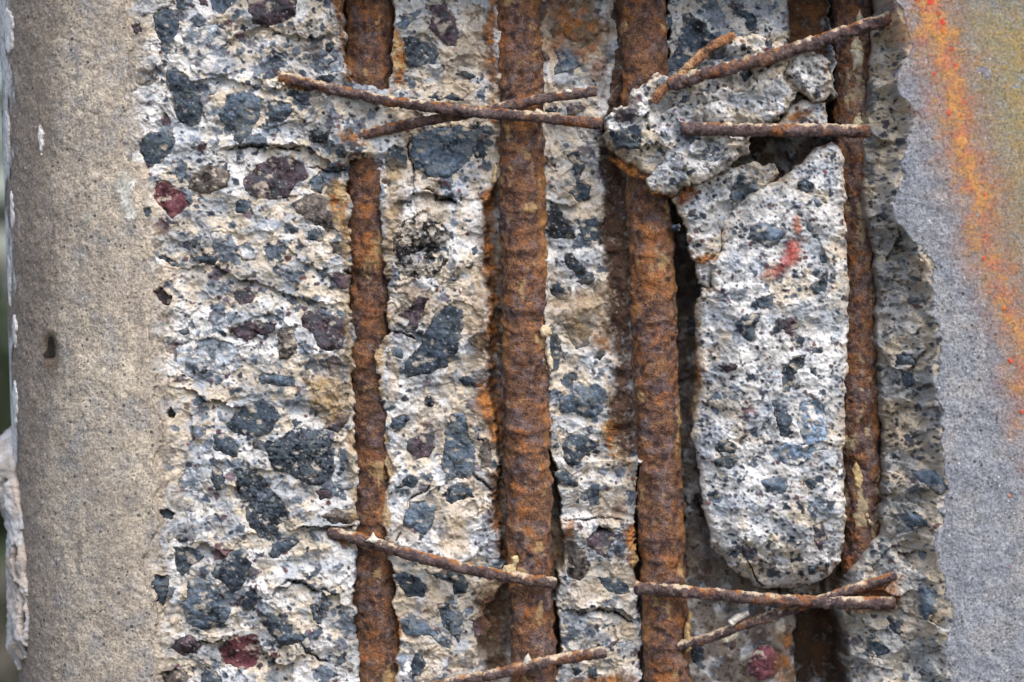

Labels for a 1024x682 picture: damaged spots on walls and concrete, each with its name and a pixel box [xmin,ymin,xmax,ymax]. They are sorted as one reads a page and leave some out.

rust [392,27,406,87]
rust [484,0,499,82]
rust [788,0,830,56]
spalling [120,0,512,682]
spalling [539,0,645,682]
spalling [665,0,954,682]
rust [489,465,506,555]
rust [625,522,639,581]
rust [851,581,899,600]
rust [476,588,507,682]
rust [570,672,635,682]
rust [777,608,850,682]